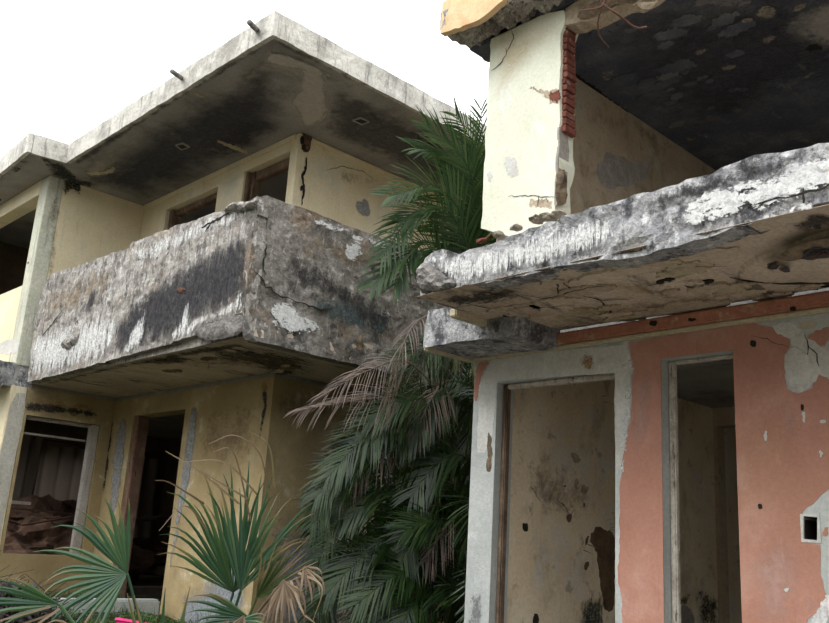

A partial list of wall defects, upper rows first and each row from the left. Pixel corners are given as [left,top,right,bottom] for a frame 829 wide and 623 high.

flaking render [530,27,577,138]
crack [299,157,307,205]
peeling [744,188,780,205]
crack [737,184,829,208]
water stain [314,219,385,261]
water stain [115,237,246,353]
crack [254,244,333,312]
water stain [271,303,319,334]
spalling [416,256,456,293]
flaking render [463,247,829,328]
water stain [50,345,313,383]
peeling [474,322,829,623]